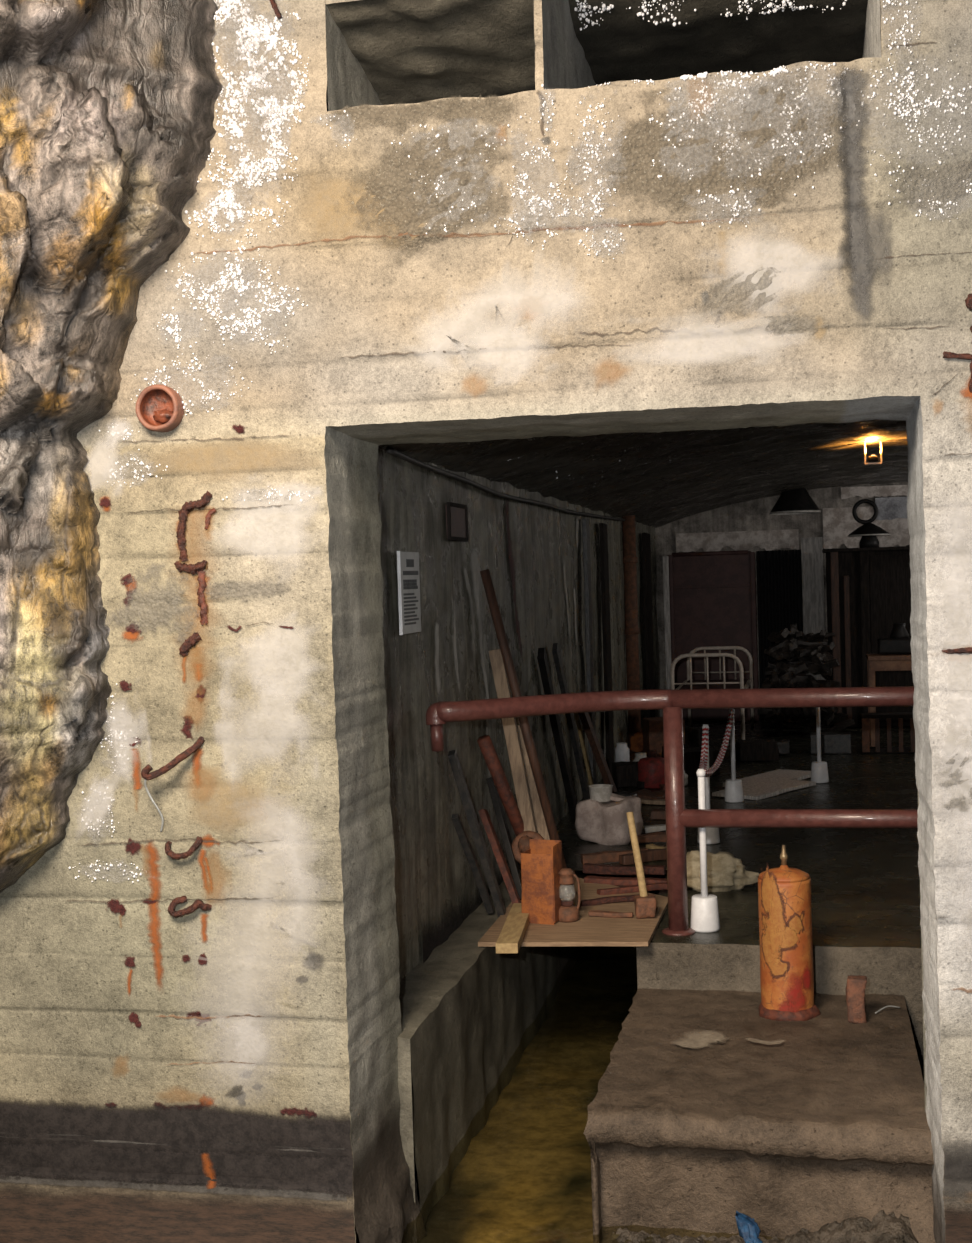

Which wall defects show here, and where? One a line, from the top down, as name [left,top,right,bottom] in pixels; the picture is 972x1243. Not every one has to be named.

damp [574,0,697,31]
damp [632,0,972,318]
damp [131,0,357,415]
rust [99,496,111,511]
damp [222,486,313,504]
rust [120,573,141,640]
rust [128,738,141,789]
rust [180,715,202,786]
rust [107,899,126,916]
rust [126,838,163,984]
damp [0,1100,355,1243]
rust [202,1154,214,1189]